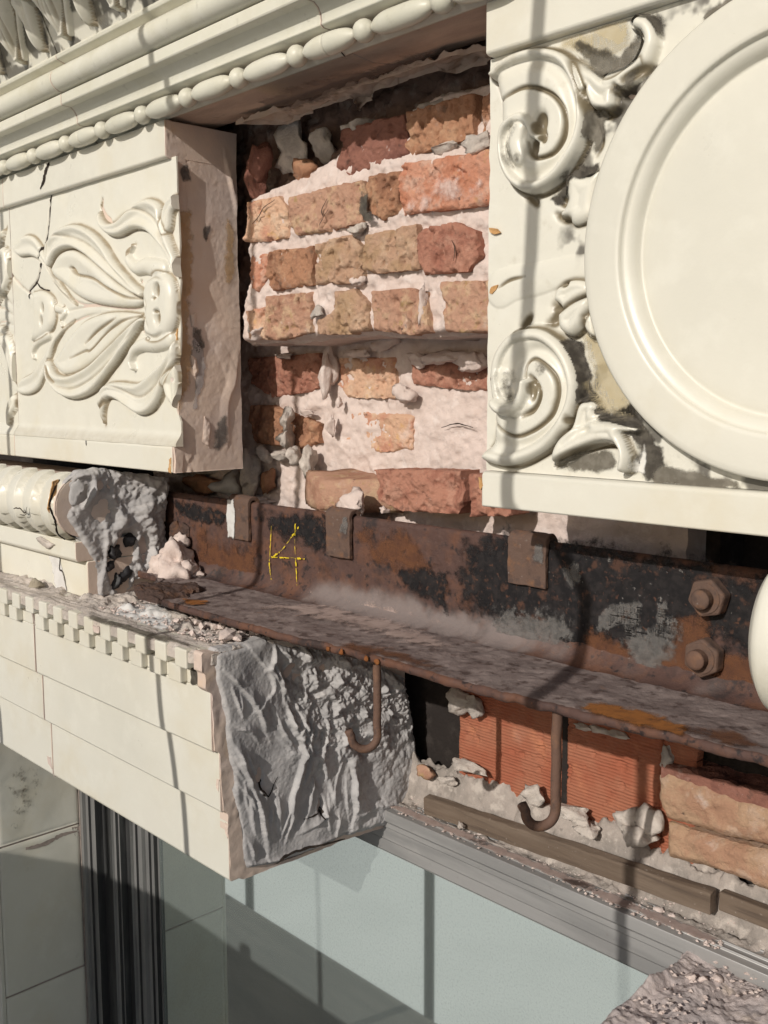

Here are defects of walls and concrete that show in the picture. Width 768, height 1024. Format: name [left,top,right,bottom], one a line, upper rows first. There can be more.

damp [566,24,628,55]
spalling [236,44,491,125]
crack [28,162,52,297]
damp [587,334,628,413]
spalling [0,454,143,474]
damp [632,451,646,473]
crack [13,479,67,590]
spalling [742,534,768,570]
rust [656,616,710,672]
rust [711,655,754,684]
spalling [405,672,460,768]
rust [583,703,756,746]